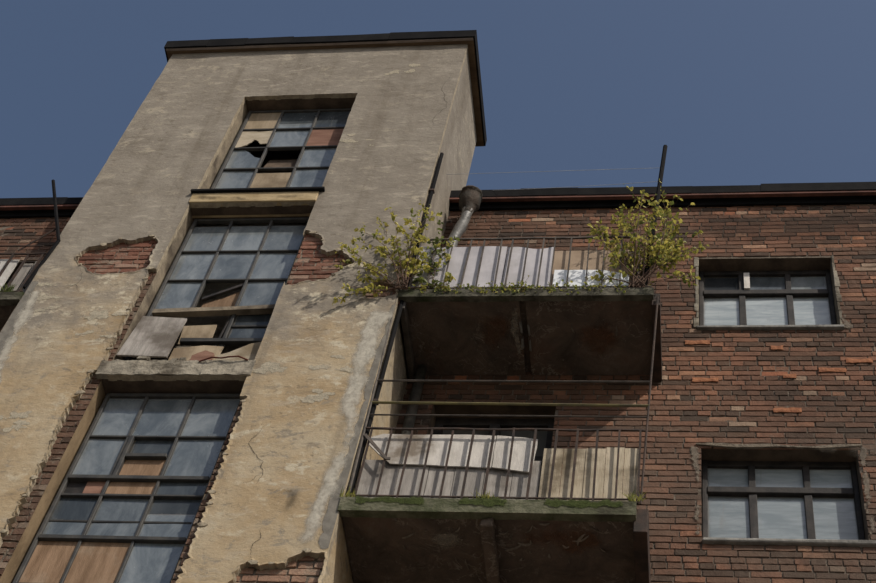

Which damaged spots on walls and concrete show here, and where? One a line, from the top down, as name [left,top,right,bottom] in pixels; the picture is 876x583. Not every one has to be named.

flaking render [74,235,160,281]
flaking render [287,229,357,286]
leakage [302,305,395,549]
flaking render [216,548,329,583]